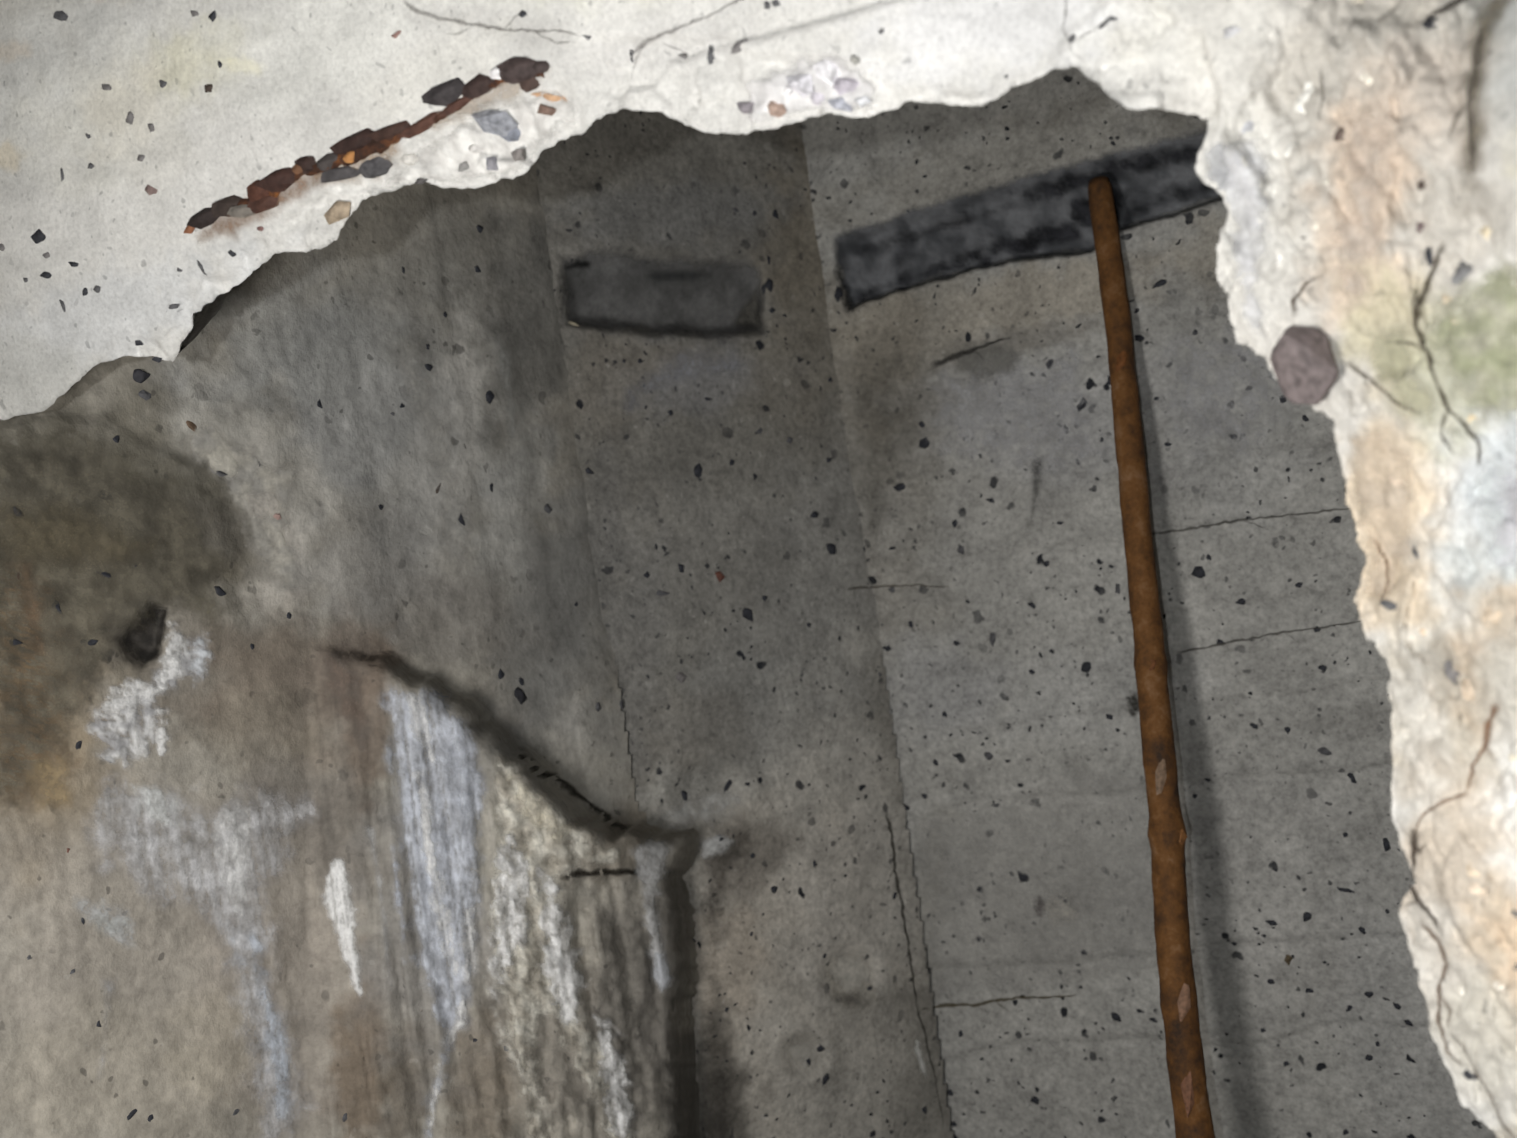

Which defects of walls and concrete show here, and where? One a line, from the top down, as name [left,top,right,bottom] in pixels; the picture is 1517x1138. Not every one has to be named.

crack [635,1,737,52]
corrosion [183,57,550,234]
spalling [386,92,574,187]
spalling [23,229,52,282]
crack [1354,248,1480,465]
peeling [190,424,297,588]
spalling [121,607,166,664]
water stain [89,634,211,767]
water stain [92,789,312,1138]
water stain [325,860,362,995]
water stain [377,691,670,1138]
crack [1410,706,1510,1132]